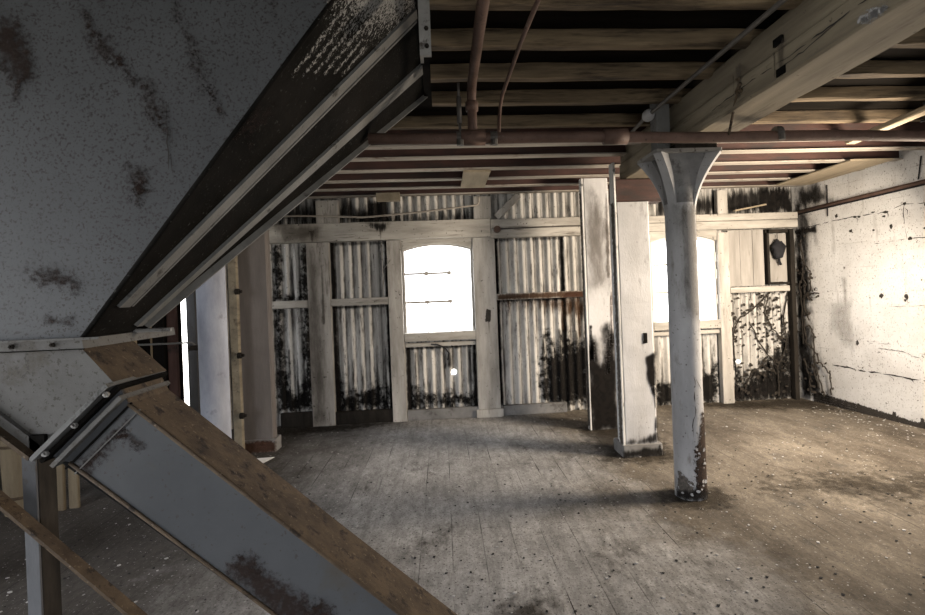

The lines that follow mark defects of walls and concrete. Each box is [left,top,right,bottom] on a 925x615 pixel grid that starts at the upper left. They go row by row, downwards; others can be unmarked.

rust [0,15,34,102]
rust [80,10,167,134]
rust [25,268,78,296]
peeling [677,412,708,501]
rust [226,555,336,615]